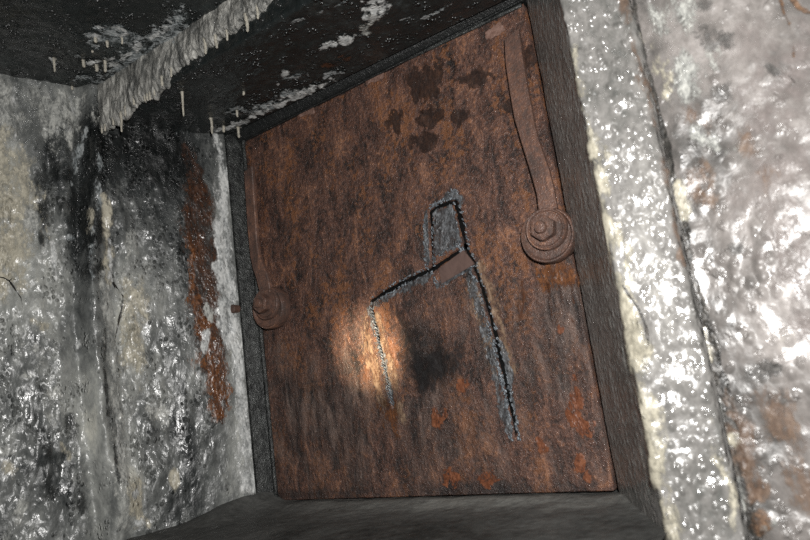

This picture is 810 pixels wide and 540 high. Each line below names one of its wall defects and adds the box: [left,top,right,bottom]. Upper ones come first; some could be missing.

efflorescence [72,4,189,83]
efflorescence [319,0,391,50]
efflorescence [649,0,702,34]
efflorescence [653,49,701,103]
efflorescence [690,126,720,152]
leakage [0,80,137,301]
efflorescence [673,180,691,221]
rust [179,144,233,424]
leakage [587,126,666,498]
leakage [103,343,122,483]
rust [565,374,597,438]
efflorescence [660,499,681,540]